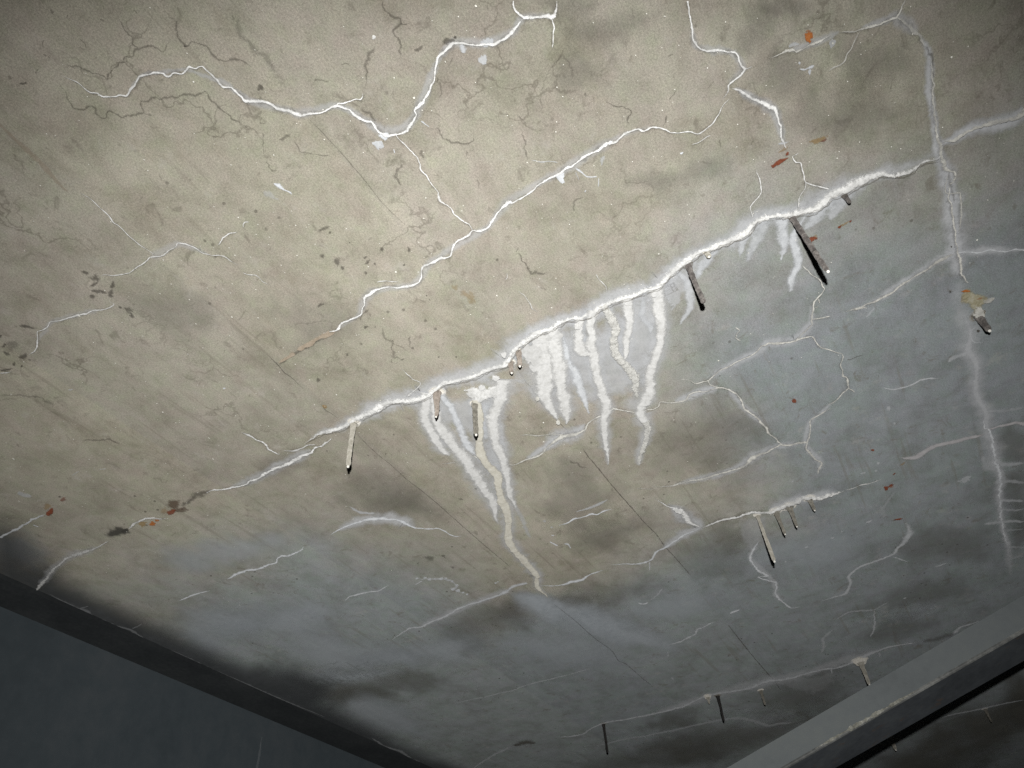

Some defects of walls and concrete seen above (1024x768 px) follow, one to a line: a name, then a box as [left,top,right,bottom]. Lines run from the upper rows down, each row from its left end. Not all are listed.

crack [29,196,265,355]
crack [68,1,1024,637]
crack [37,542,107,590]
crack [560,610,914,738]
crack [942,700,1022,718]